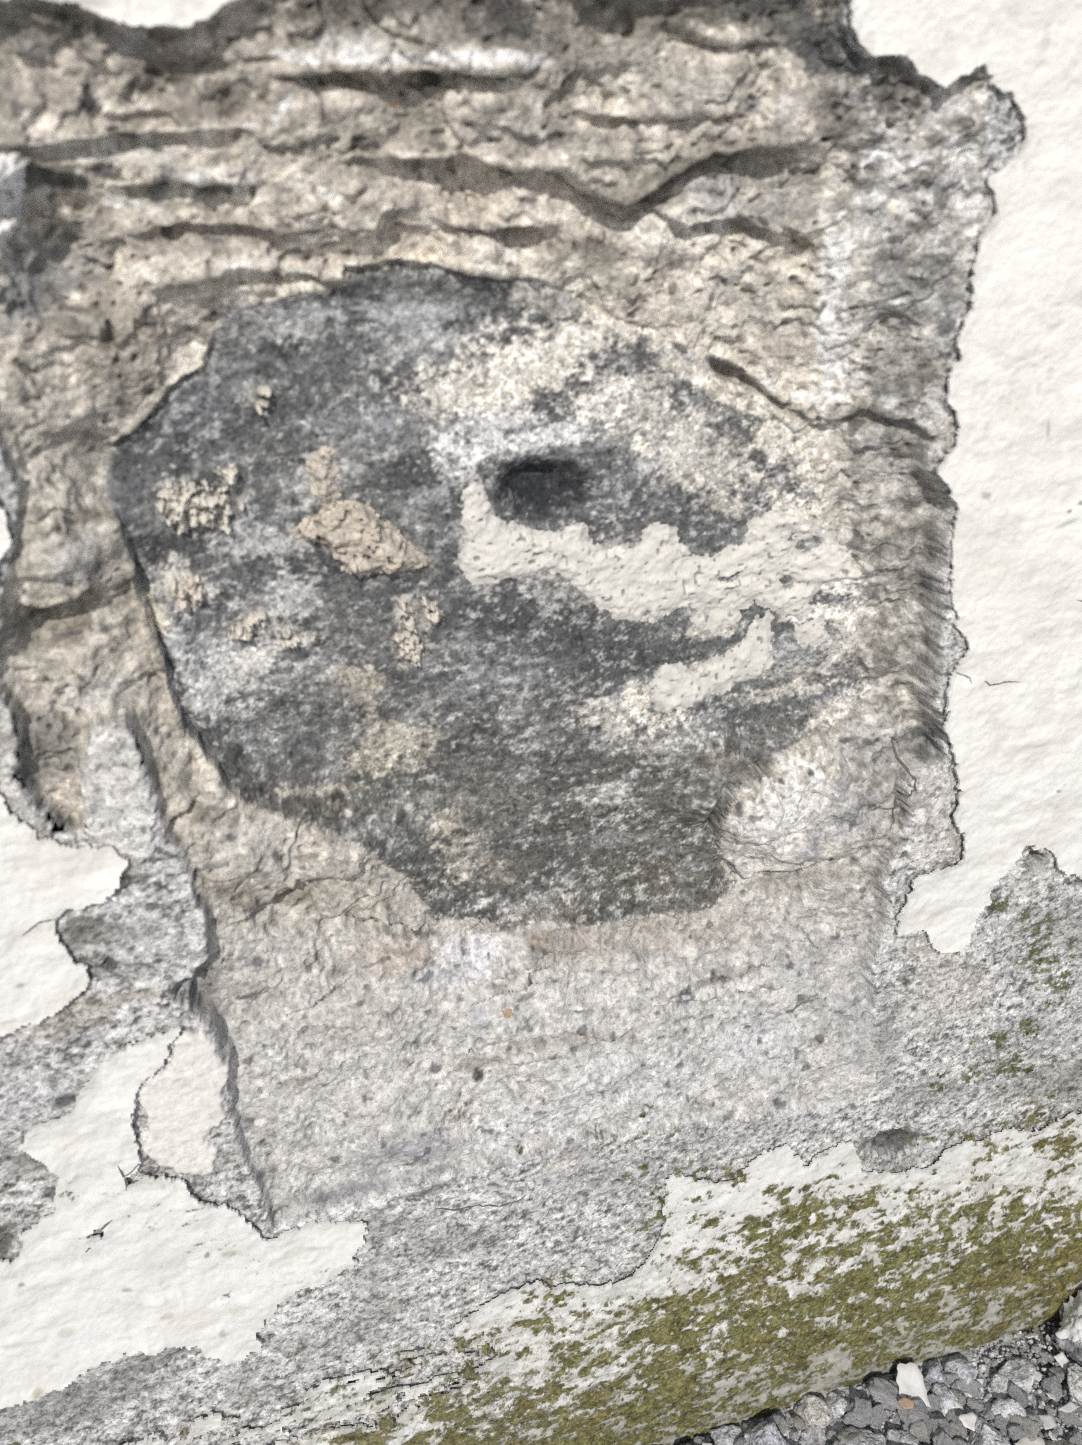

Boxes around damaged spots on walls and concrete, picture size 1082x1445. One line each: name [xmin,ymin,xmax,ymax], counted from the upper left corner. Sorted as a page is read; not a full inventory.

spalling [941,63,1025,408]
spalling [0,0,992,1229]
peeling [869,832,1082,1173]
damp [321,1367,527,1445]
peeling [0,1094,873,1445]
peeling [896,1362,932,1409]
peeling [1053,1351,1070,1370]
peeling [1058,1401,1080,1413]